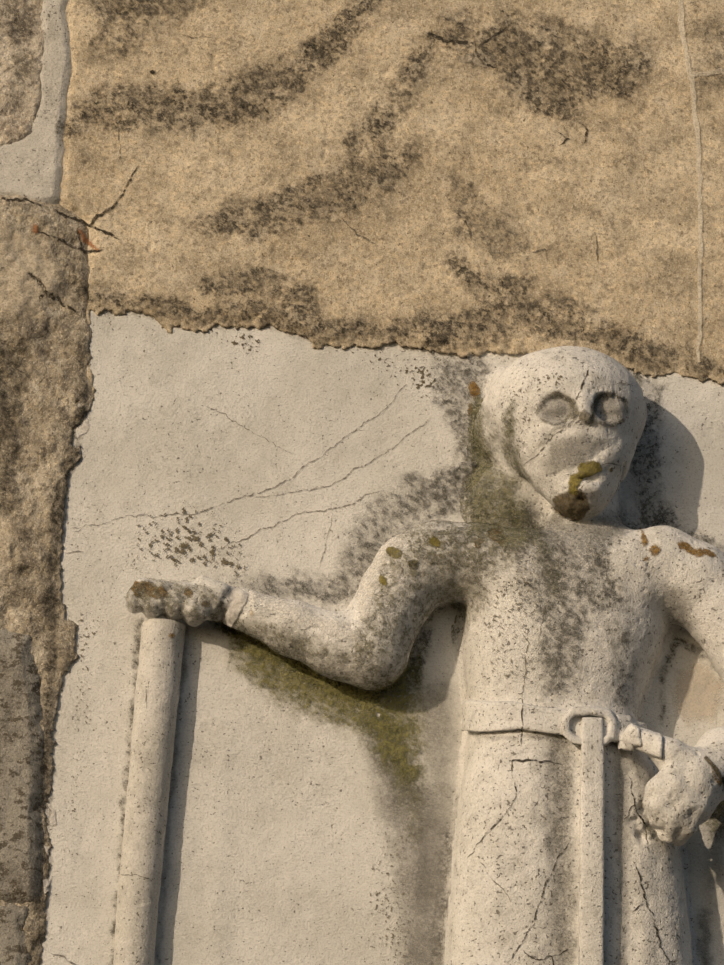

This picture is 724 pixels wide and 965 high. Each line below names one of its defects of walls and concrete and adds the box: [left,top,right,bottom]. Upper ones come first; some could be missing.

crack [69,385,428,562]
damp [627,511,673,529]
crack [468,576,562,900]
crack [512,843,569,965]
crack [624,777,676,965]